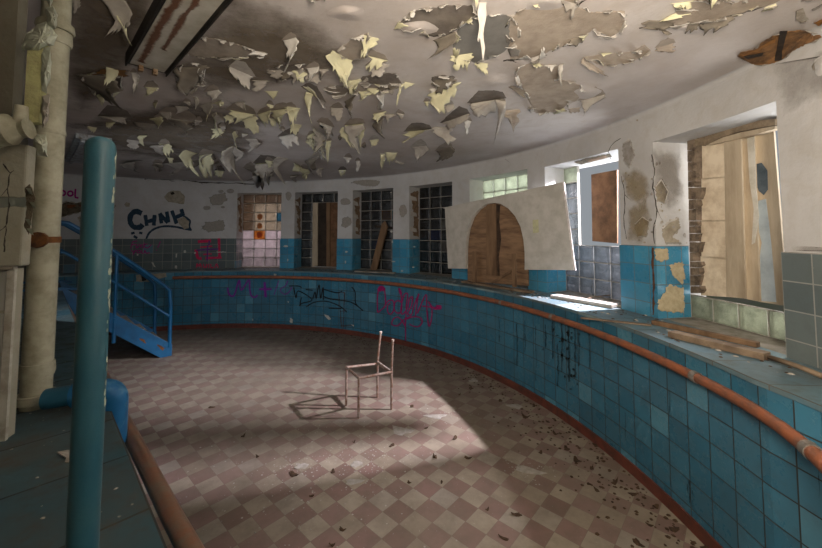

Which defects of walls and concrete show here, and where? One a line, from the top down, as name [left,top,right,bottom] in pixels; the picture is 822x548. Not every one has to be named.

rust [138,0,200,64]
peeling [581,0,780,76]
peeling [795,0,822,44]
peeling [77,0,627,237]
peeling [622,139,636,188]
crack [0,164,14,252]
flaking render [24,184,36,235]
flaking render [61,201,81,218]
spalling [635,138,707,313]
leakage [535,322,590,390]